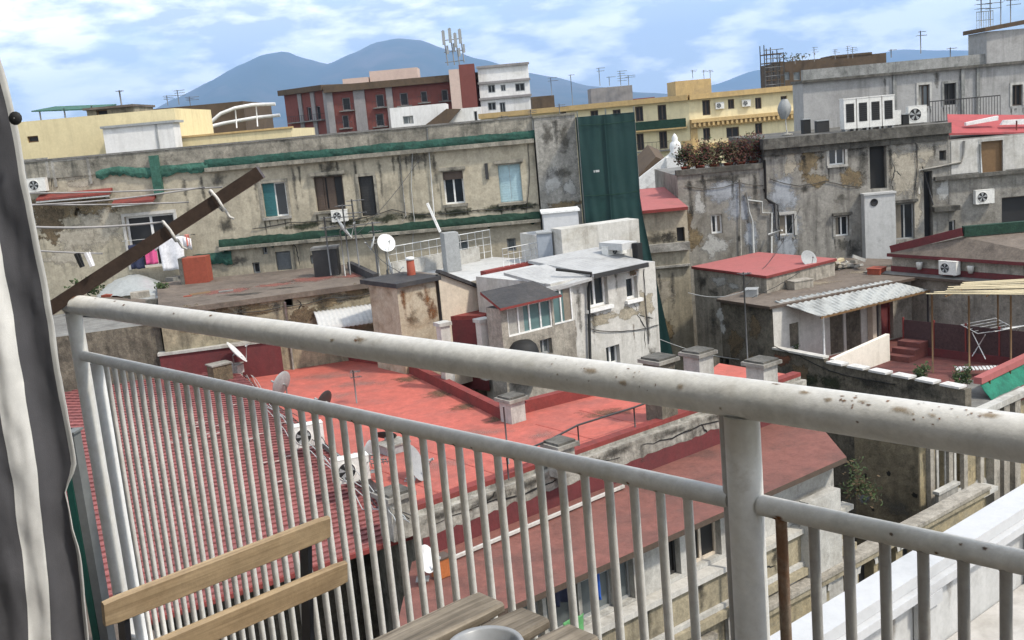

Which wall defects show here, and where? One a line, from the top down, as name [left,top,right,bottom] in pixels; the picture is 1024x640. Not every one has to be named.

damp [543,122,568,153]
peeling [767,152,865,255]
rust [418,288,437,318]